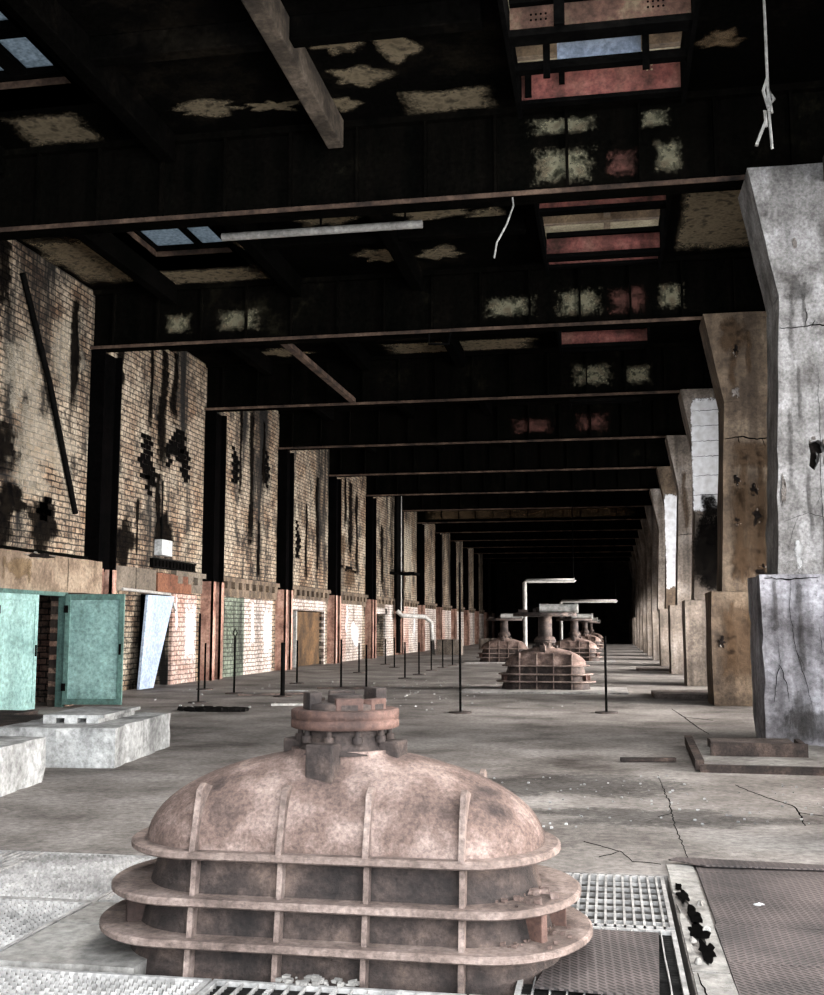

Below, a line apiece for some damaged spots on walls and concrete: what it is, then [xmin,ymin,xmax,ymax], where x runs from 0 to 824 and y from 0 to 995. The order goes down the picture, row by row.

peeling [326,38,422,87]
peeling [175,99,301,117]
peeling [400,86,495,114]
peeling [9,114,99,146]
peeling [536,150,591,181]
leakage [69,300,81,409]
leakage [148,350,179,540]
spalling [809,436,824,469]
crack [658,775,688,857]
crack [736,785,823,826]
crack [584,841,659,864]
spalling [675,883,717,965]